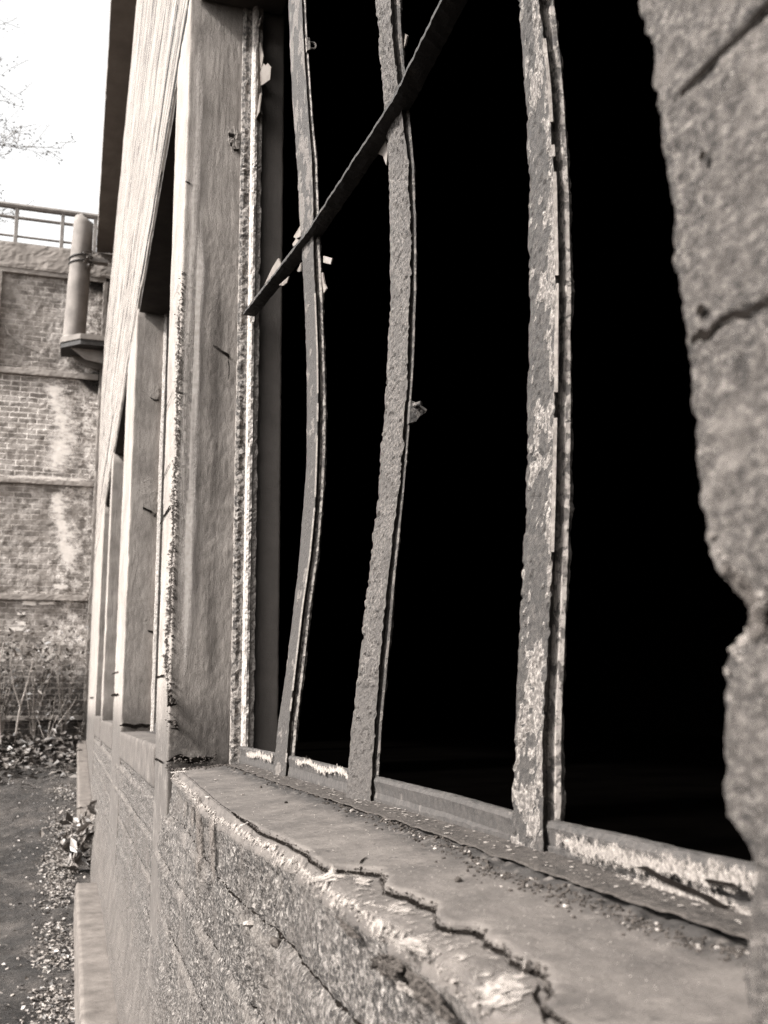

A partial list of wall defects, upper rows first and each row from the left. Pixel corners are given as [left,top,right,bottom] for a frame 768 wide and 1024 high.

crack [680,2,768,96]
crack [690,296,768,344]
crack [231,812,572,1024]